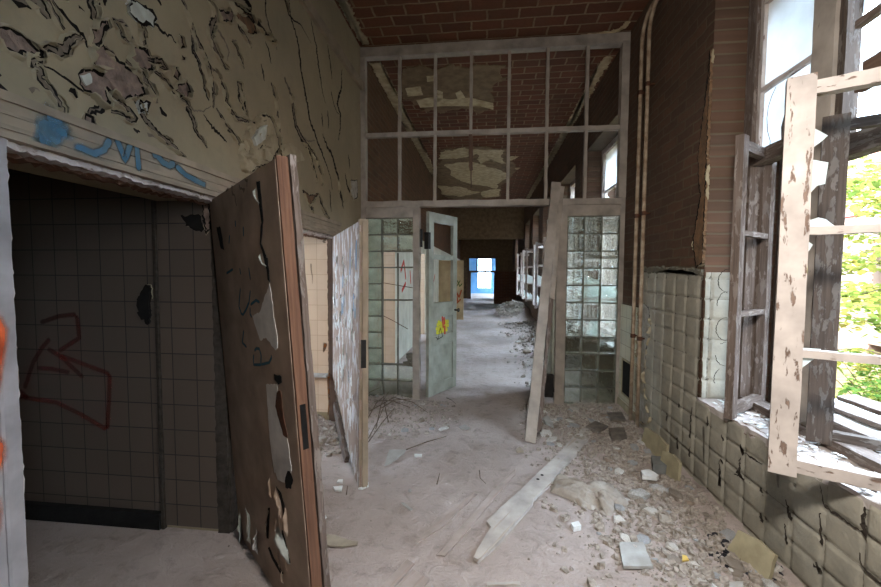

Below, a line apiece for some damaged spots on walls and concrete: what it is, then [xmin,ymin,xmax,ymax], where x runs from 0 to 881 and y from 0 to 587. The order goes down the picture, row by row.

spalling [0,0,283,174]
crack [244,0,353,207]
peeling [284,77,330,219]
spalling [136,284,153,325]
crack [666,398,793,544]
crack [813,486,881,585]